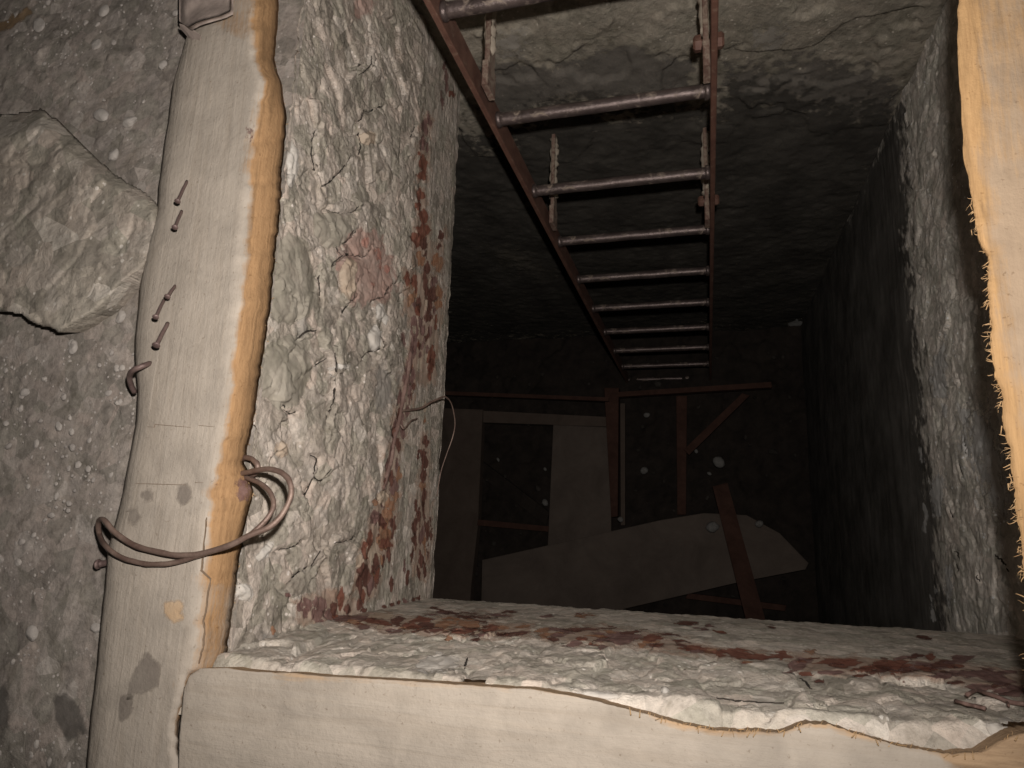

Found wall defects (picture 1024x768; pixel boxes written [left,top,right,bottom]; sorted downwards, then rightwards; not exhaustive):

crack [310,106,382,296]
crack [315,348,380,419]
corrosion [285,113,1024,697]